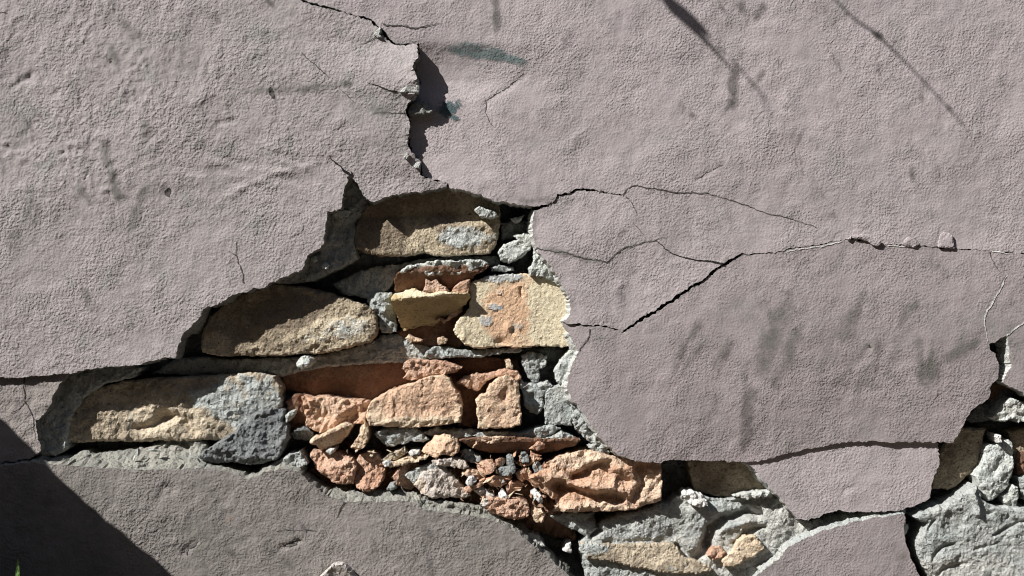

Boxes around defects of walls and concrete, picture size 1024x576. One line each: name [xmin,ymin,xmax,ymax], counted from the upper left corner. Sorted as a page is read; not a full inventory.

crack [303,1,441,47]
crack [301,52,405,114]
crack [329,156,353,179]
crack [531,165,860,351]
crack [887,245,1024,340]
spalling [40,181,824,576]
spalling [904,388,1024,576]